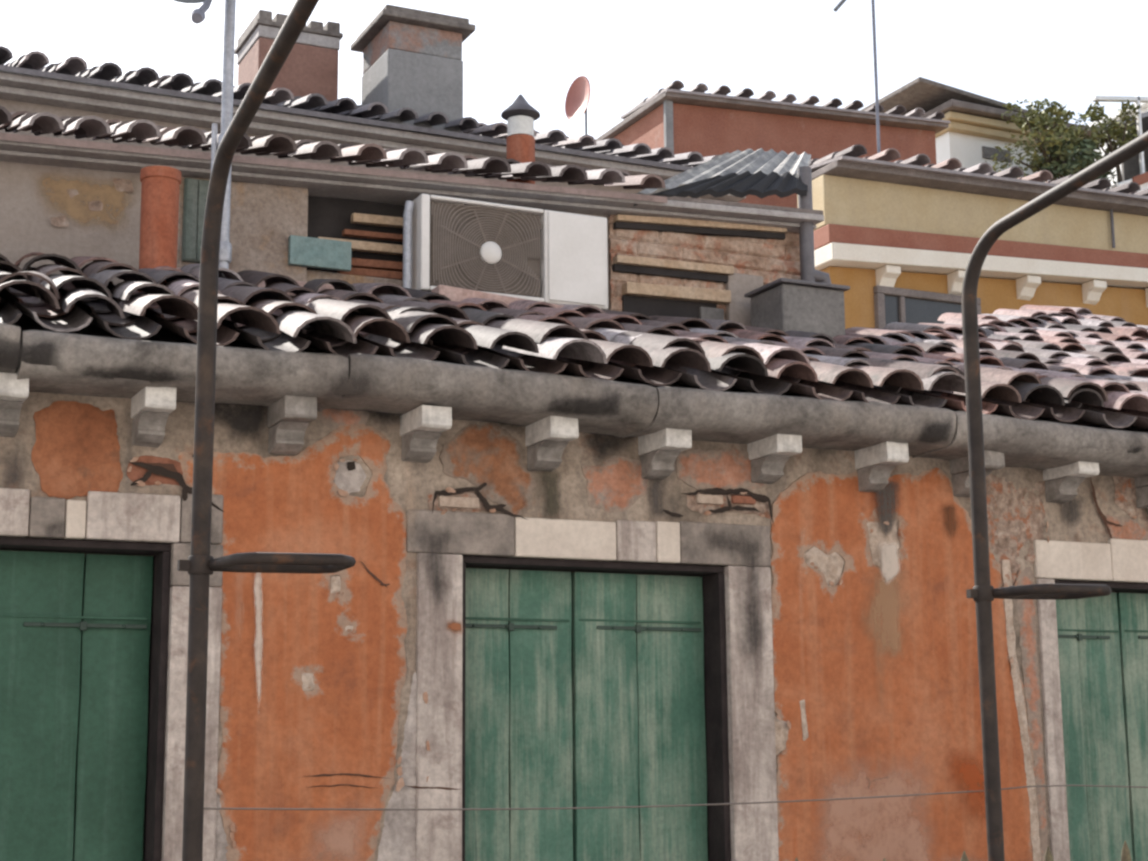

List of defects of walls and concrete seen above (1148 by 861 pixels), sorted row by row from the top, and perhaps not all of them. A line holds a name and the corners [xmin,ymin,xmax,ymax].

crack [128,454,224,512]
flaking render [334,459,366,497]
flaking render [427,487,496,515]
flaking render [686,492,771,519]
flaking render [867,520,904,567]
flaking render [803,546,844,587]
flaking render [986,474,1049,861]